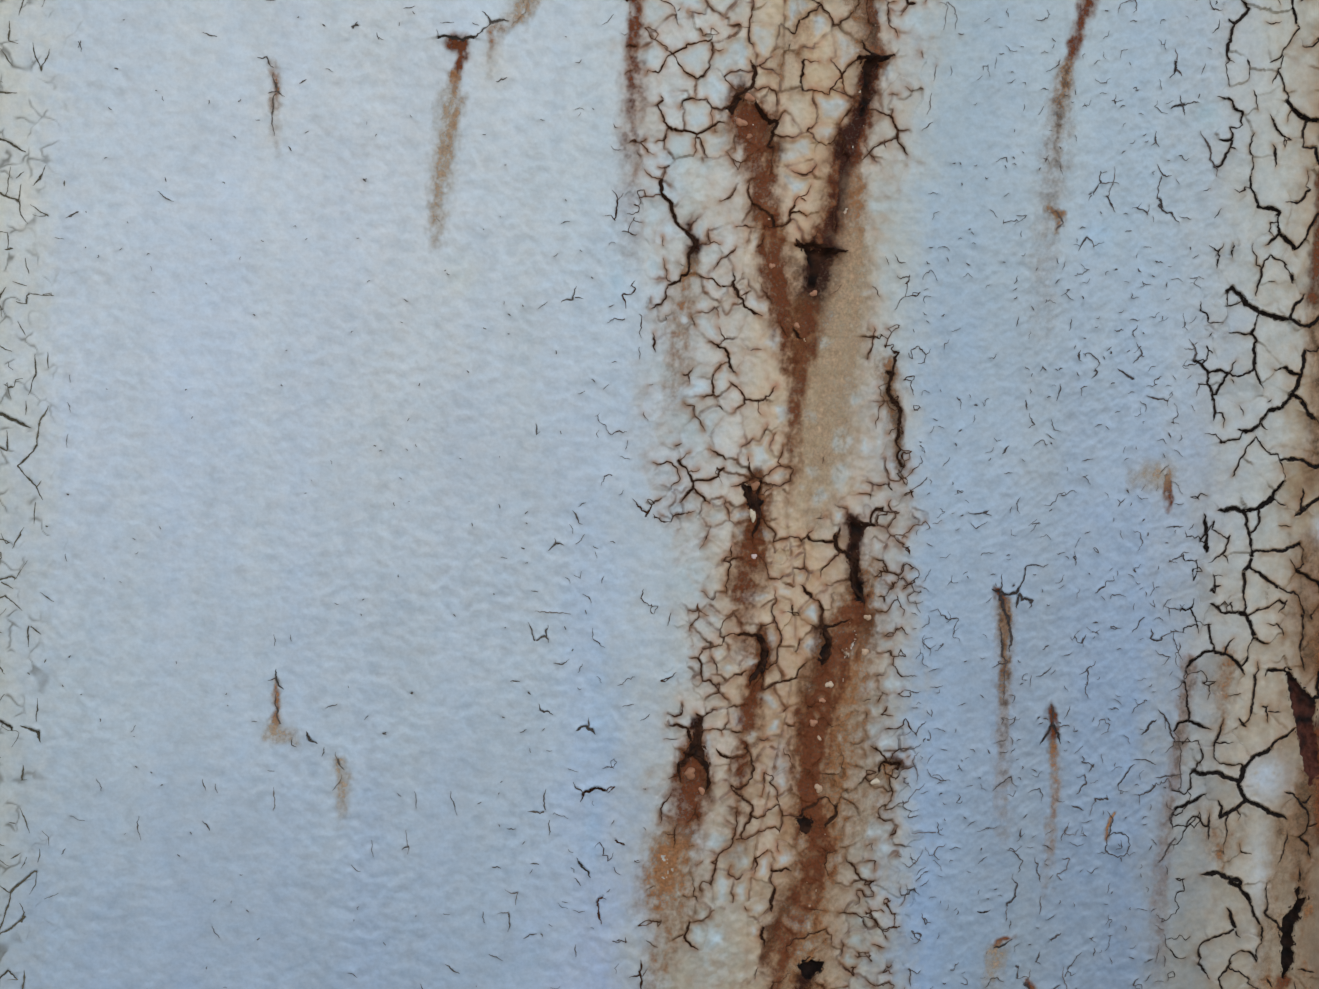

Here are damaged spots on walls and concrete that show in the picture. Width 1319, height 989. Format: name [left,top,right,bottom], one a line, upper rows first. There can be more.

rust [432,34,468,223]
rust [623,0,646,143]
rust [672,223,702,360]
rust [720,0,889,495]
rust [1052,0,1094,167]
rust [1306,172,1319,360]
crack [0,138,155,934]
rust [643,716,713,972]
rust [727,468,774,825]
rust [759,513,905,989]
crack [450,0,1319,989]
rust [994,587,1012,748]